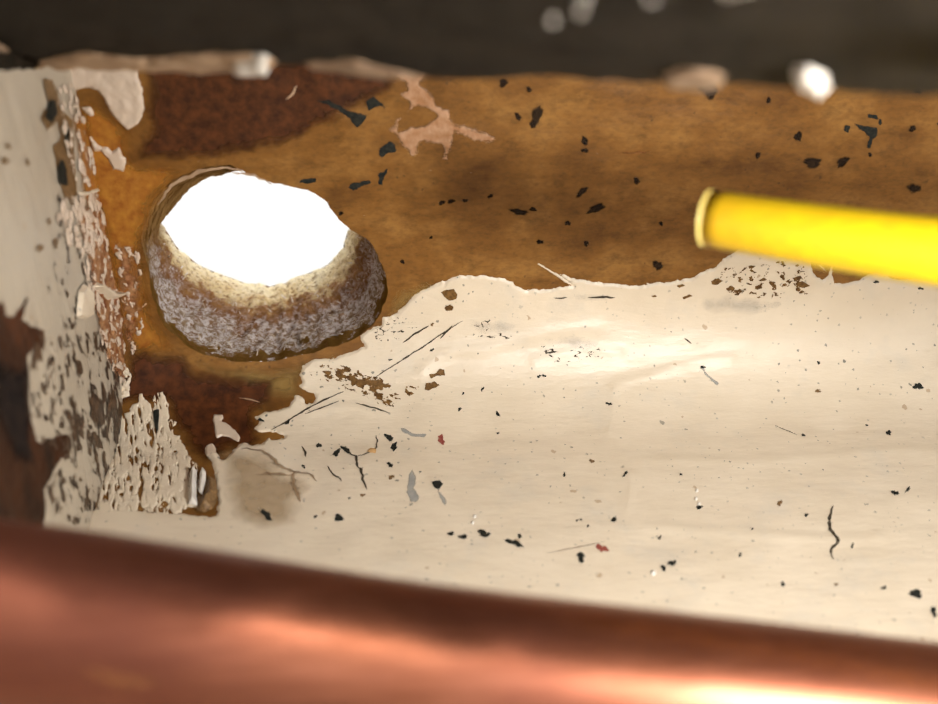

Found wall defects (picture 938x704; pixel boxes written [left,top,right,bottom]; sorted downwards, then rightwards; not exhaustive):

peeling [233,53,269,77]
peeling [662,68,728,100]
peeling [792,66,832,100]
leakage [143,65,391,158]
peeling [89,137,126,172]
corrosion [57,191,146,384]
leakage [75,106,316,517]
spalling [441,289,457,311]
spalling [711,261,810,299]
peeling [0,219,206,525]
spalling [311,364,445,407]
peeling [205,414,240,457]